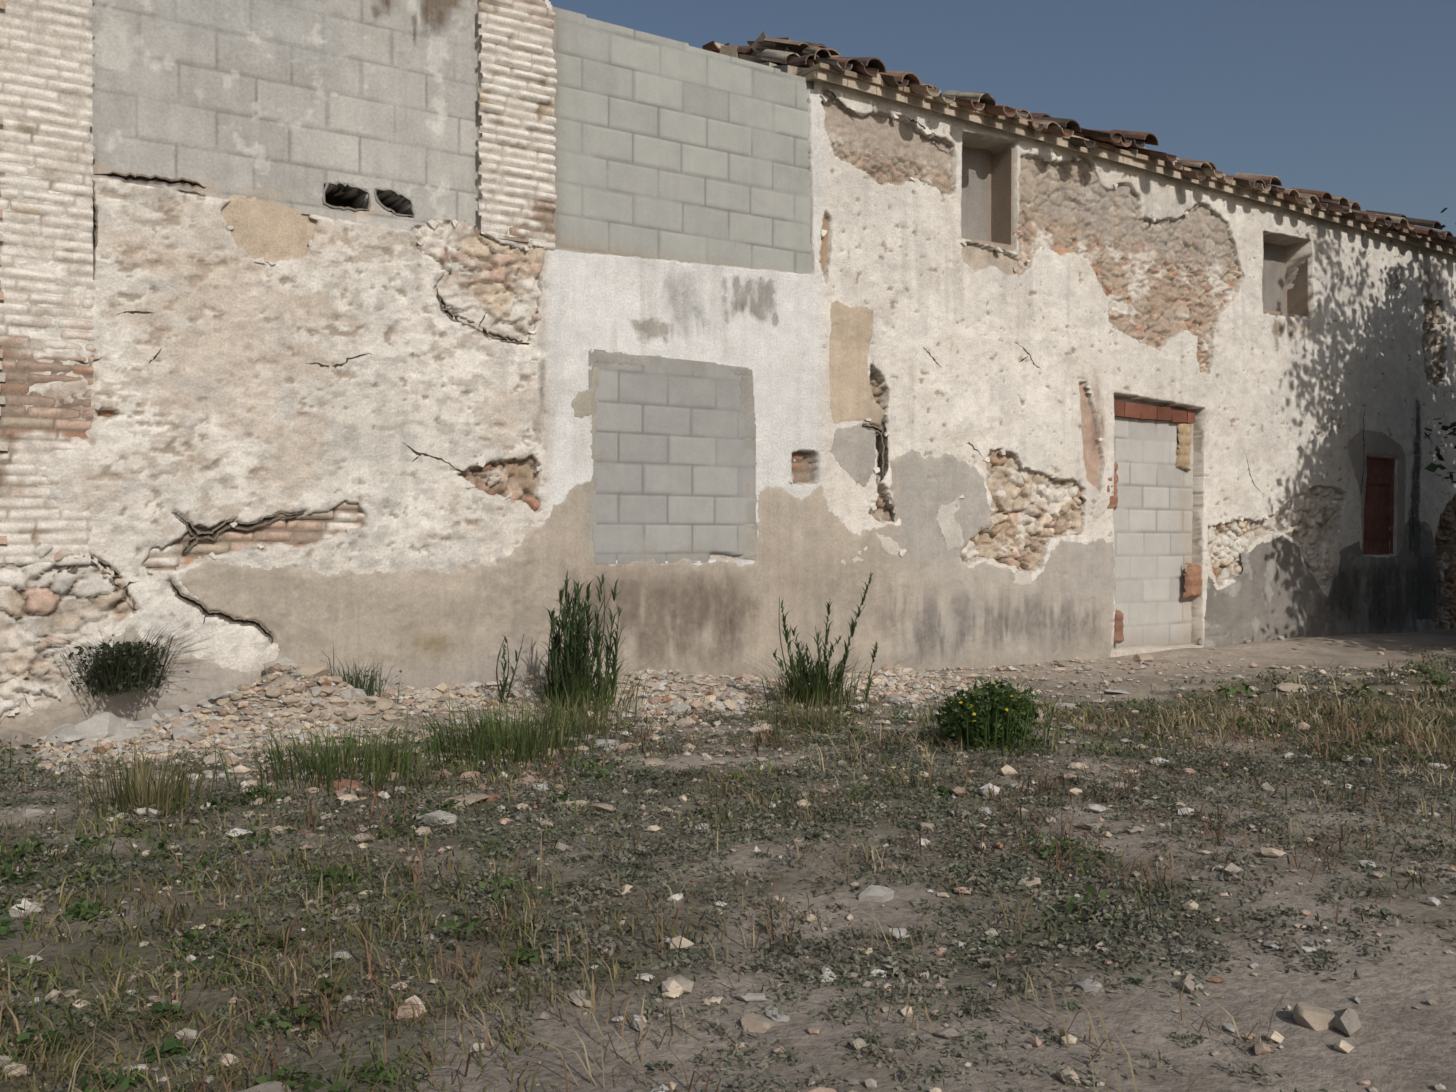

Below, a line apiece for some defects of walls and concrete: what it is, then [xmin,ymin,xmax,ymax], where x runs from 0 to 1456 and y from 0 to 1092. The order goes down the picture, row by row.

flaking render [819,90,952,194]
flaking render [221,180,545,343]
flaking render [961,153,1242,375]
flaking render [0,543,134,716]
crack [57,511,304,643]
flaking render [142,501,365,573]
flaking render [458,457,541,511]
flaking render [959,383,1118,573]
flaking render [1183,487,1343,598]
leakage [1331,400,1439,623]
flaking render [1435,495,1456,630]